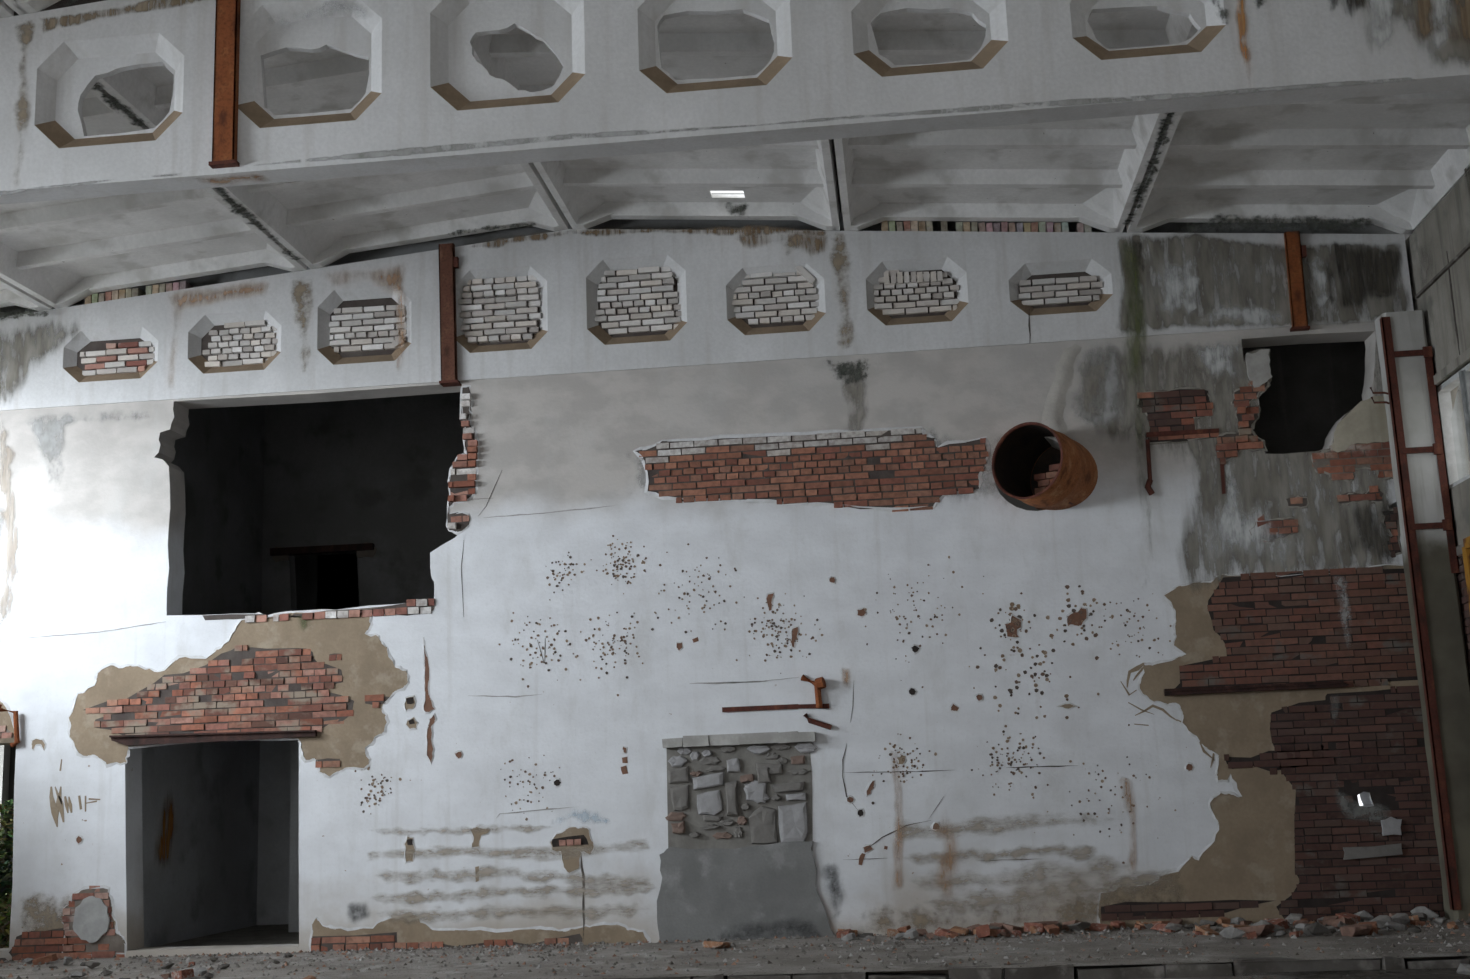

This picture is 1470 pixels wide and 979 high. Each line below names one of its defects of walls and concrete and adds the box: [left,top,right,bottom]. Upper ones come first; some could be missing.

rust [1237,0,1248,60]
damp [1331,0,1470,63]
damp [0,309,74,400]
damp [33,415,73,462]
spalling [446,385,480,535]
peeling [633,426,991,512]
peeling [1136,349,1272,465]
damp [1079,112,1407,623]
damp [0,431,17,624]
peeling [49,598,437,827]
peeling [949,396,1445,929]
peeling [9,885,127,960]